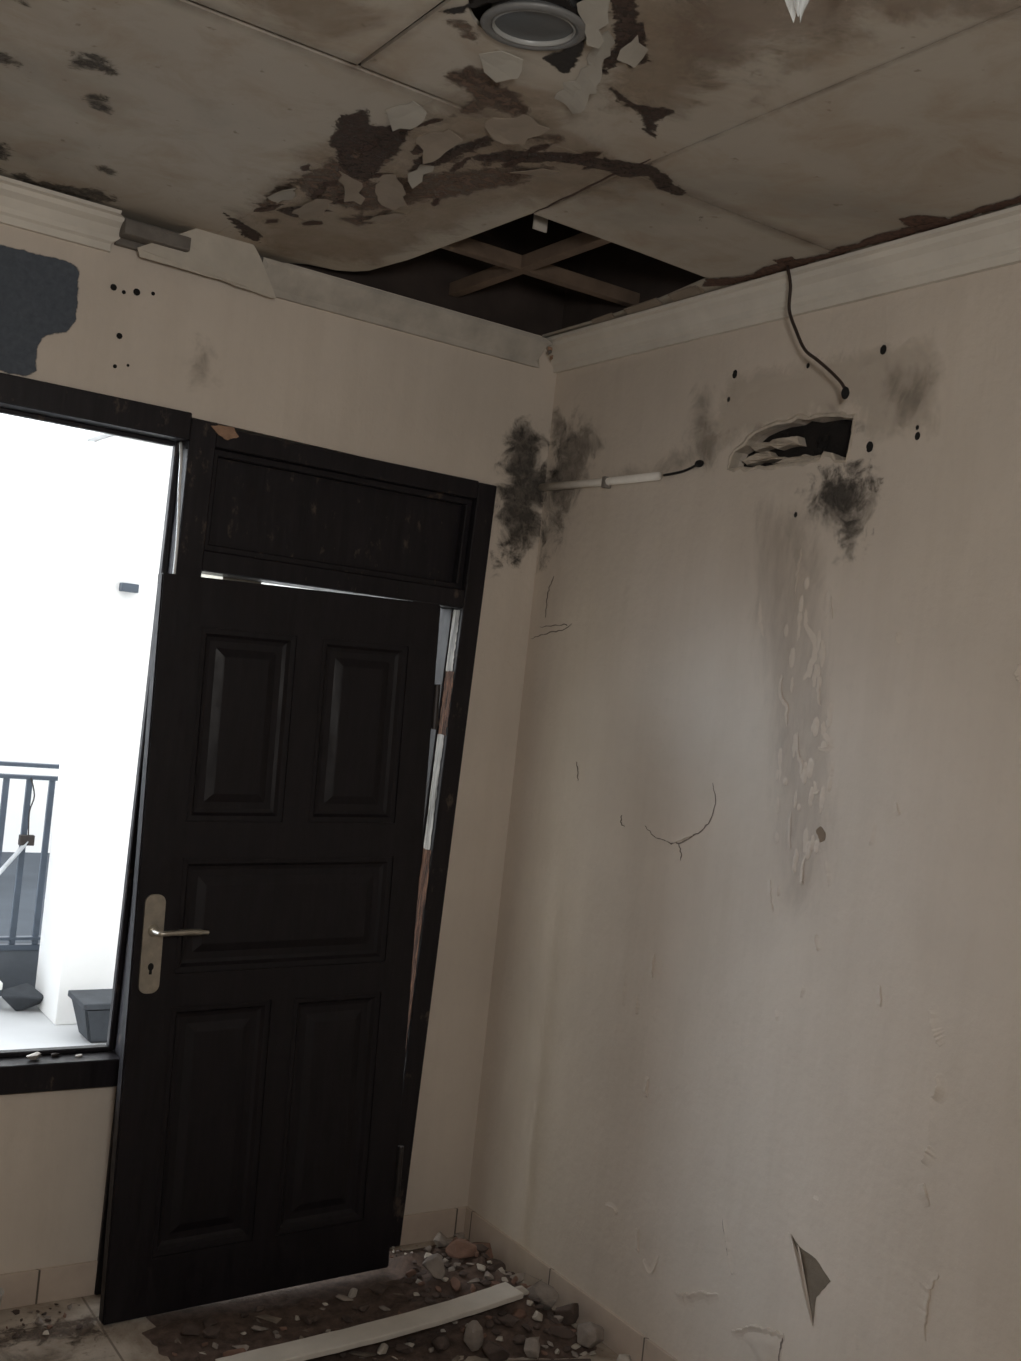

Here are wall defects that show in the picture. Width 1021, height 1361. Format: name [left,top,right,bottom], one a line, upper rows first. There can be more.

peeling [479,50,523,83]
peeling [267,101,462,223]
peeling [485,114,549,144]
peeling [0,245,79,376]
hole [727,411,857,472]
mould [497,423,589,565]
mould [815,461,877,529]
crack [620,783,716,860]
peeling [788,1233,831,1326]